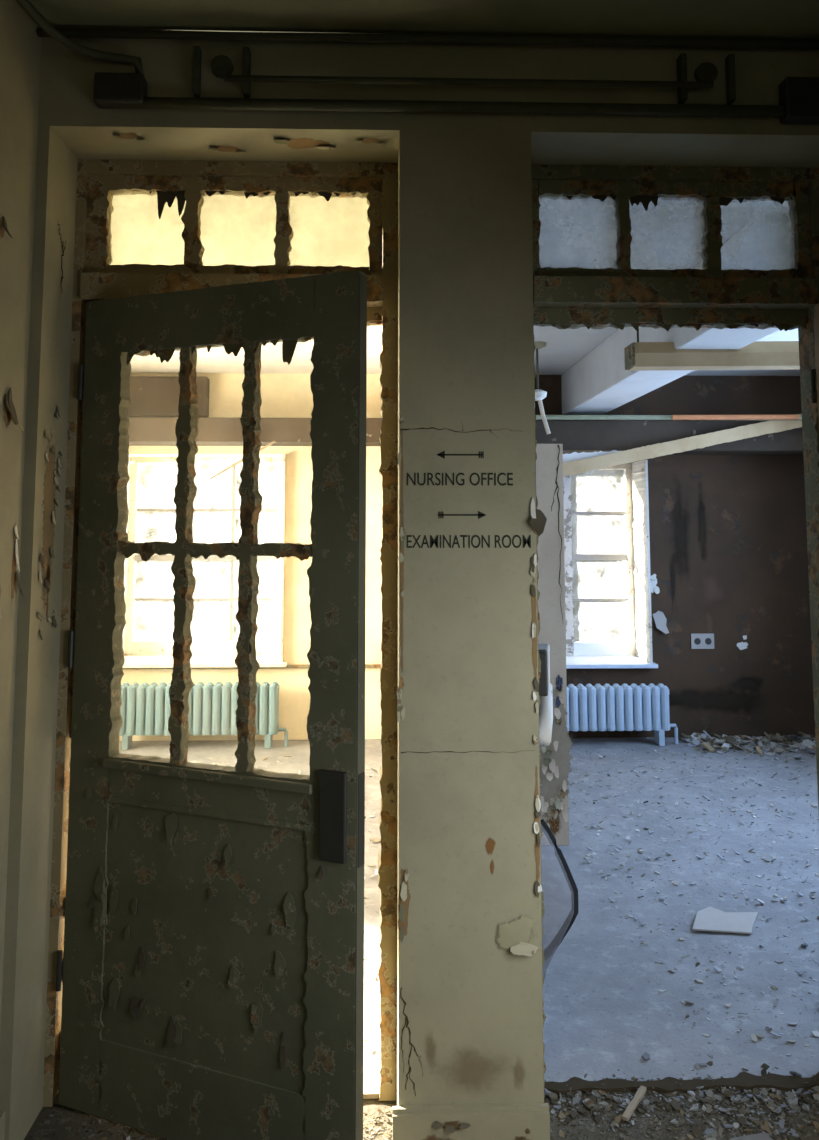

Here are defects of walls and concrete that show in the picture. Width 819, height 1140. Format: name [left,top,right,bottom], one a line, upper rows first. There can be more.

peeling [134,190,186,219]
peeling [294,192,356,202]
peeling [37,430,63,640]
peeling [529,498,547,536]
water stain [670,499,706,598]
peeling [530,554,573,898]
spalling [432,1121,471,1133]